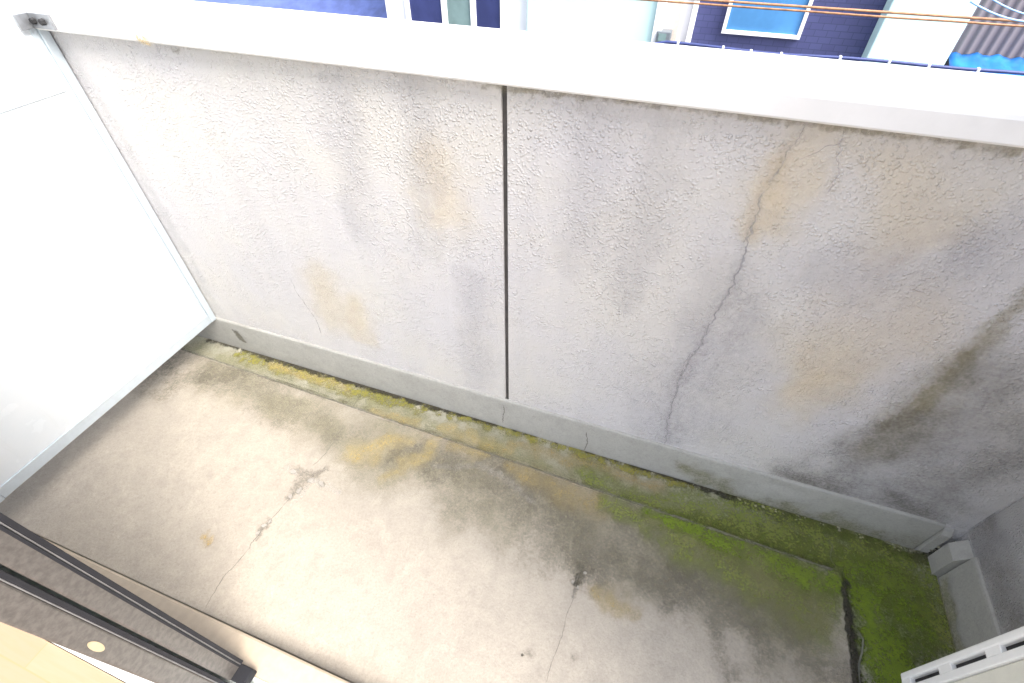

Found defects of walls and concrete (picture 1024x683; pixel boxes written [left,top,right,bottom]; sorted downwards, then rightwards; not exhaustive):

crack [664,127,805,444]
crack [206,388,365,606]
crack [547,562,587,679]